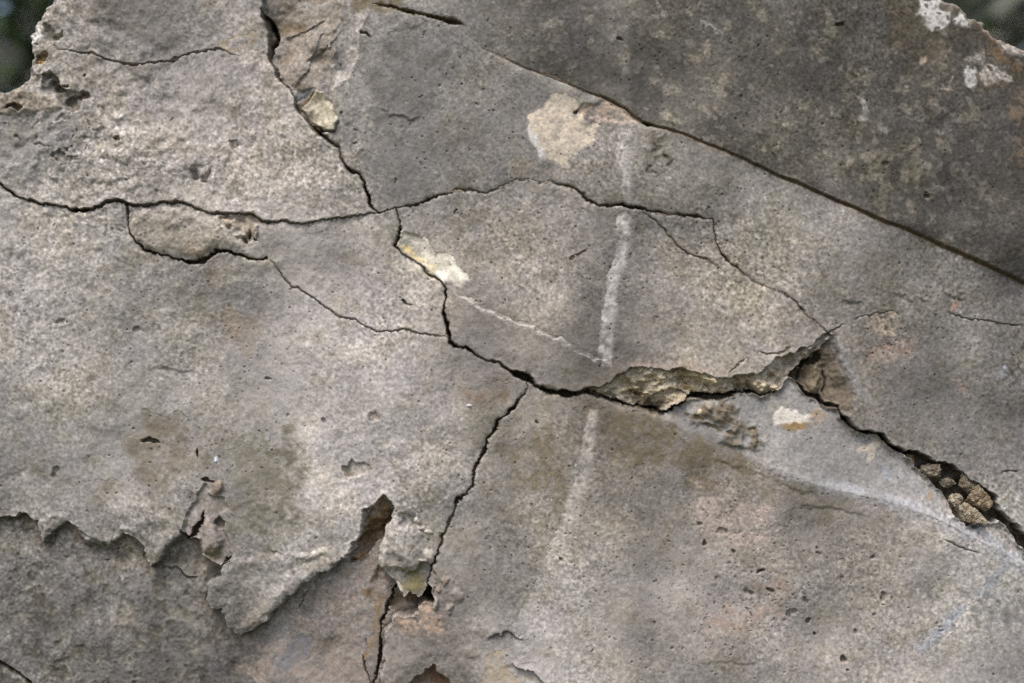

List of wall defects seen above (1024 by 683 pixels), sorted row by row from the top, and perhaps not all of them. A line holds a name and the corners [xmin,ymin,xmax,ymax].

spalling [261,0,344,117]
crack [372,3,466,27]
crack [482,48,1024,286]
crack [0,7,895,584]
crack [947,311,1024,328]
spalling [586,333,1024,578]
crack [788,374,1024,550]
crack [0,659,33,683]
peeling [0,483,435,683]
crack [362,584,398,683]
crack [943,539,981,556]